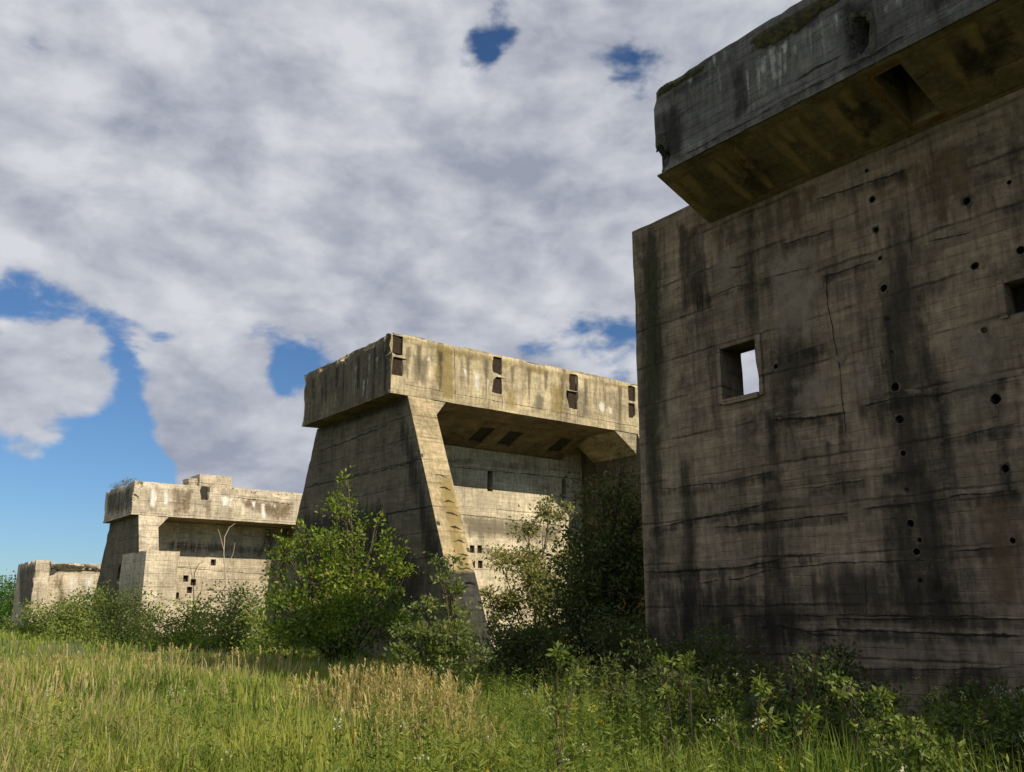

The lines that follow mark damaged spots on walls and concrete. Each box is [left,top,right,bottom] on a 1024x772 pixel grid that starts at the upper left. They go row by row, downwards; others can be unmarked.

water stain [737,43,787,115]
water stain [406,346,442,383]
water stain [641,232,673,552]
crack [696,260,1024,438]
water stain [811,214,964,643]
water stain [108,490,131,512]
water stain [150,487,190,510]
water stain [221,496,290,519]
water stain [650,466,820,681]